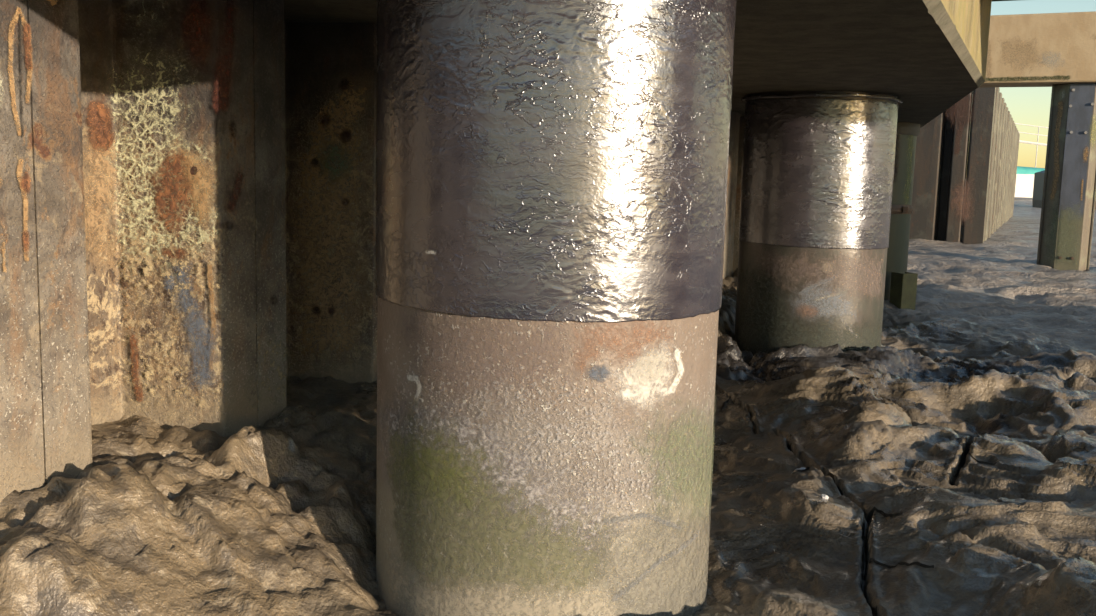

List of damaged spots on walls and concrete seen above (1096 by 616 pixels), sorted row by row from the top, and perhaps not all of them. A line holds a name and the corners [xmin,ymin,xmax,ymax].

corrosion [153,149,216,390]
peeling [620,388,638,399]